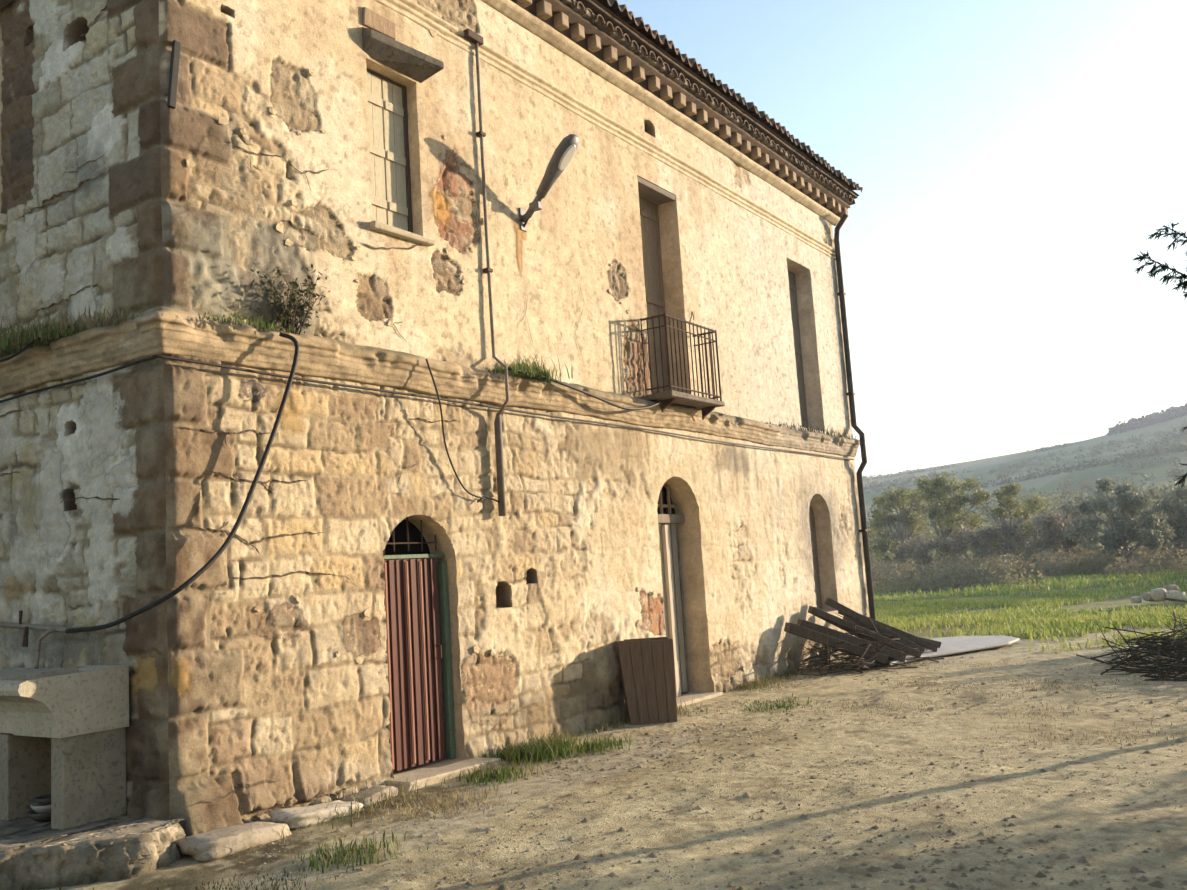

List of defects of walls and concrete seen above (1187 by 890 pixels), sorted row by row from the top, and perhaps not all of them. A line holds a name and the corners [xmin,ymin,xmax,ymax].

crack [220,138,329,192]
flaking render [174,117,394,326]
flaking render [269,60,327,136]
flaking render [431,135,484,296]
flaking render [607,259,651,399]
flaking render [637,587,664,635]